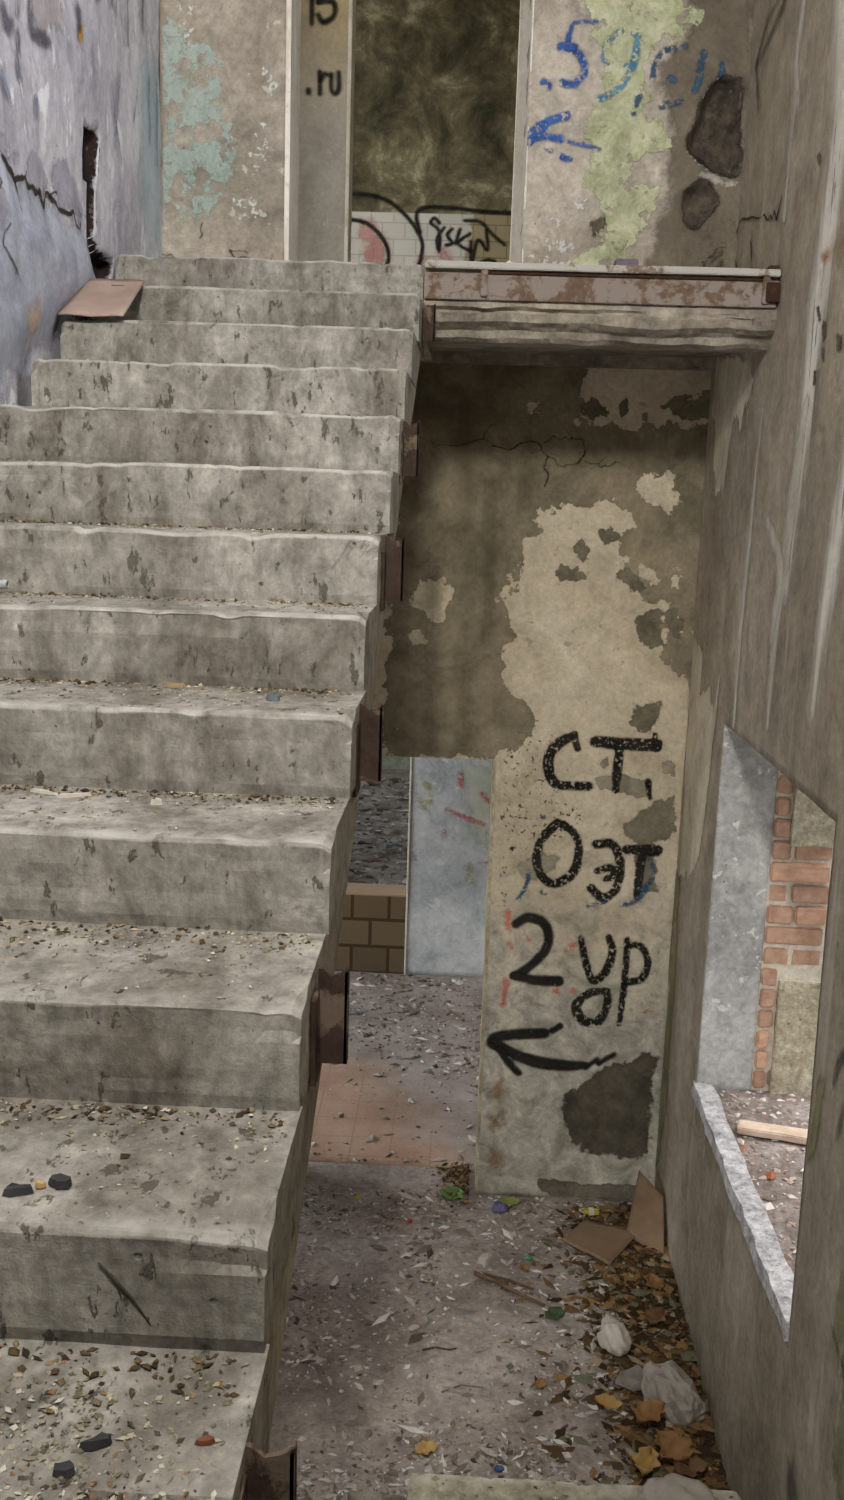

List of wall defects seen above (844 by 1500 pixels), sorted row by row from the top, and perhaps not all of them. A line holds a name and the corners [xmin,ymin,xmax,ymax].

crack [0,154,81,274]
peeling [28,0,64,33]
spalling [0,126,113,279]
peeling [163,0,268,224]
peeling [261,67,279,98]
peeling [528,0,745,265]
crack [431,425,629,487]
flaking render [378,354,754,1167]